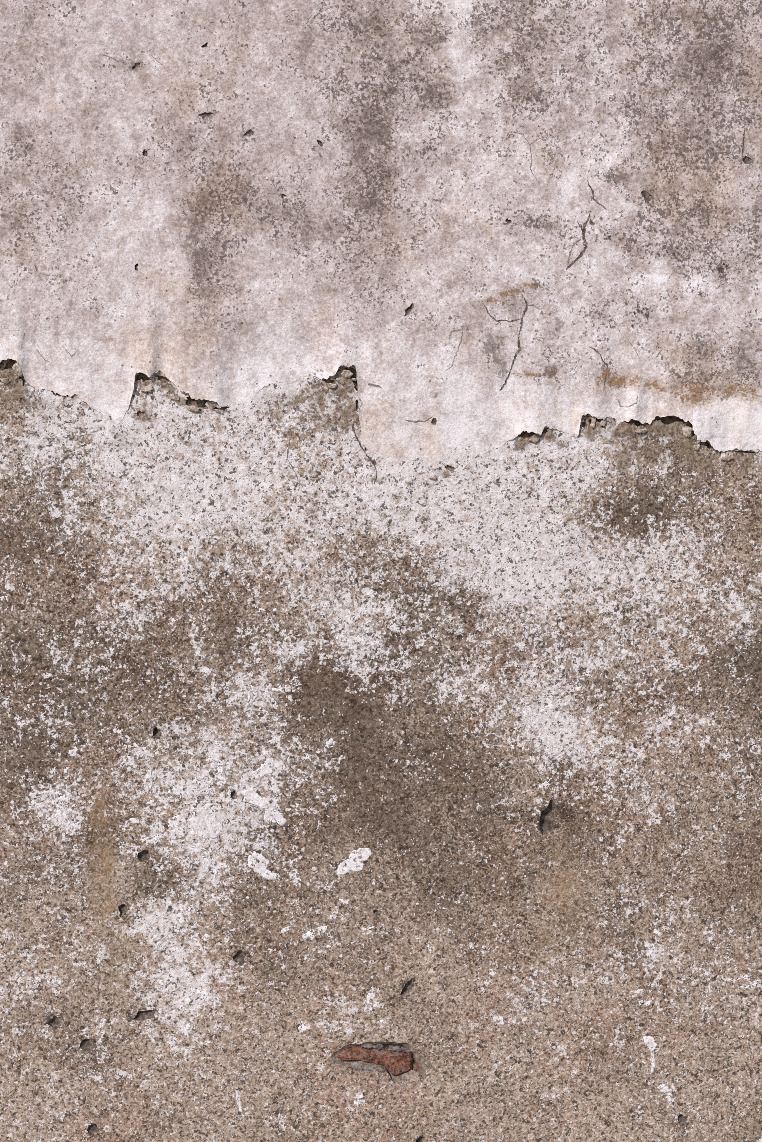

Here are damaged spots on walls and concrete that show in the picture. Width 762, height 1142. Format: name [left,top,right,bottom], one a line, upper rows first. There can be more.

crack [483,288,539,391]
spalling [133,372,231,422]
spalling [267,367,360,435]
spalling [513,428,567,451]
spalling [581,415,762,479]
peeling [235,629,325,707]
damp [298,643,386,749]
peeling [28,747,83,836]
peeling [120,721,288,890]
damp [550,795,582,846]
peeling [337,848,372,875]
spalling [330,1041,430,1082]